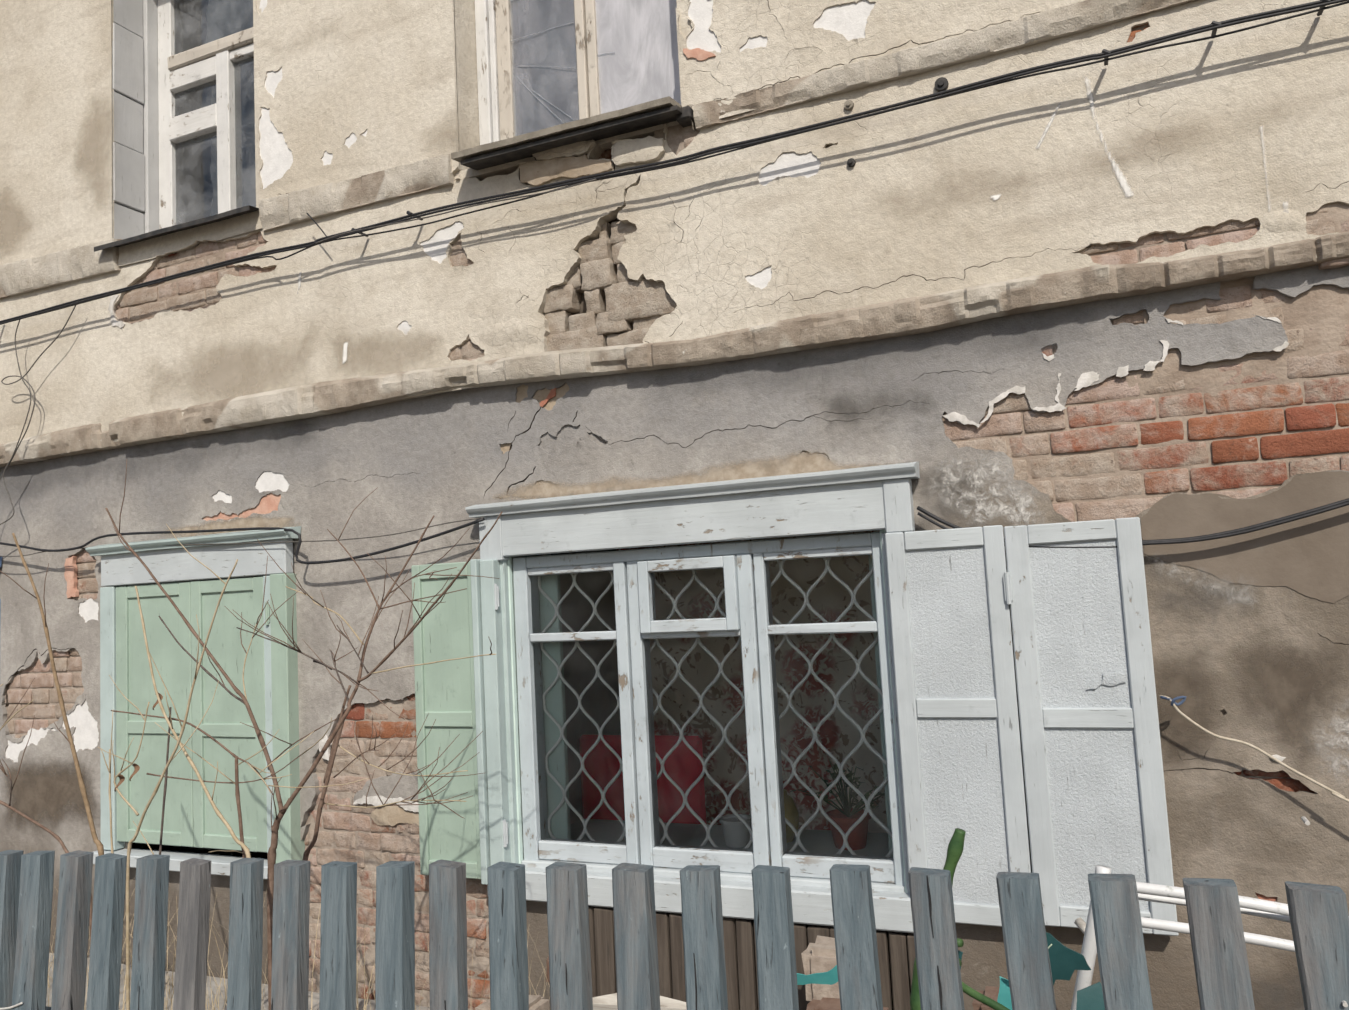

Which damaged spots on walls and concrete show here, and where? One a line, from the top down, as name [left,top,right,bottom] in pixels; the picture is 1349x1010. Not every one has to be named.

peeling [259,68,293,189]
spalling [108,232,276,328]
peeling [420,221,474,267]
spalling [1077,219,1260,265]
peeling [203,471,290,521]
crack [484,407,541,499]
crack [573,370,998,460]
spalling [937,258,1349,523]
spalling [4,648,99,763]
spalling [1234,755,1316,793]
spalling [304,694,430,1007]
spalling [466,878,490,1010]